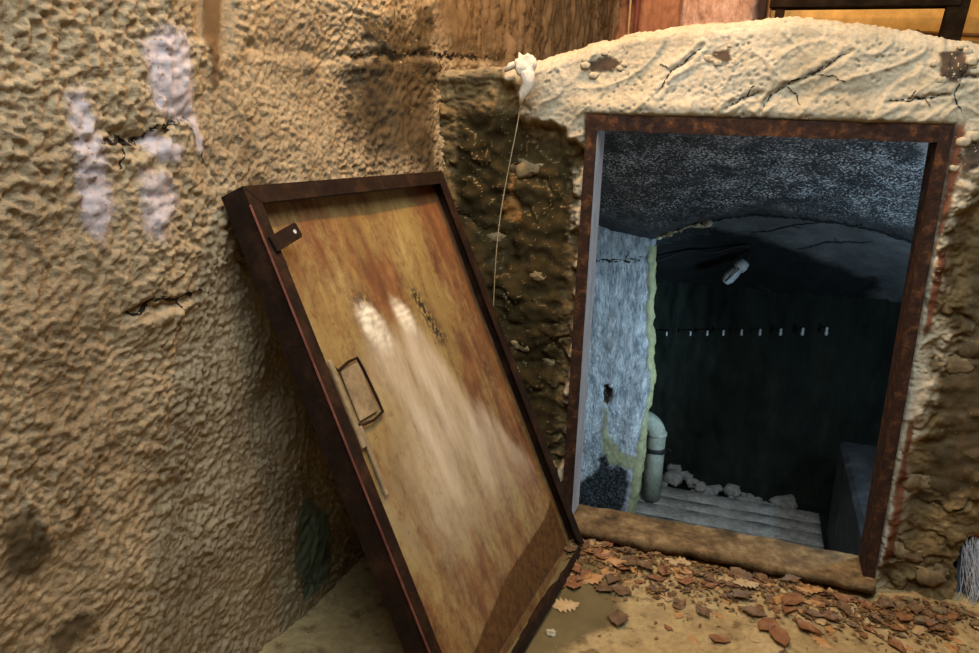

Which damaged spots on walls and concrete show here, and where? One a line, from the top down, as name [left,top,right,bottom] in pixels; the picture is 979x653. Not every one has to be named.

crack [72,117,207,169]
crack [712,213,912,250]
crack [596,254,644,263]
crack [125,288,207,330]
flaking render [455,110,572,468]
spalling [604,383,614,404]